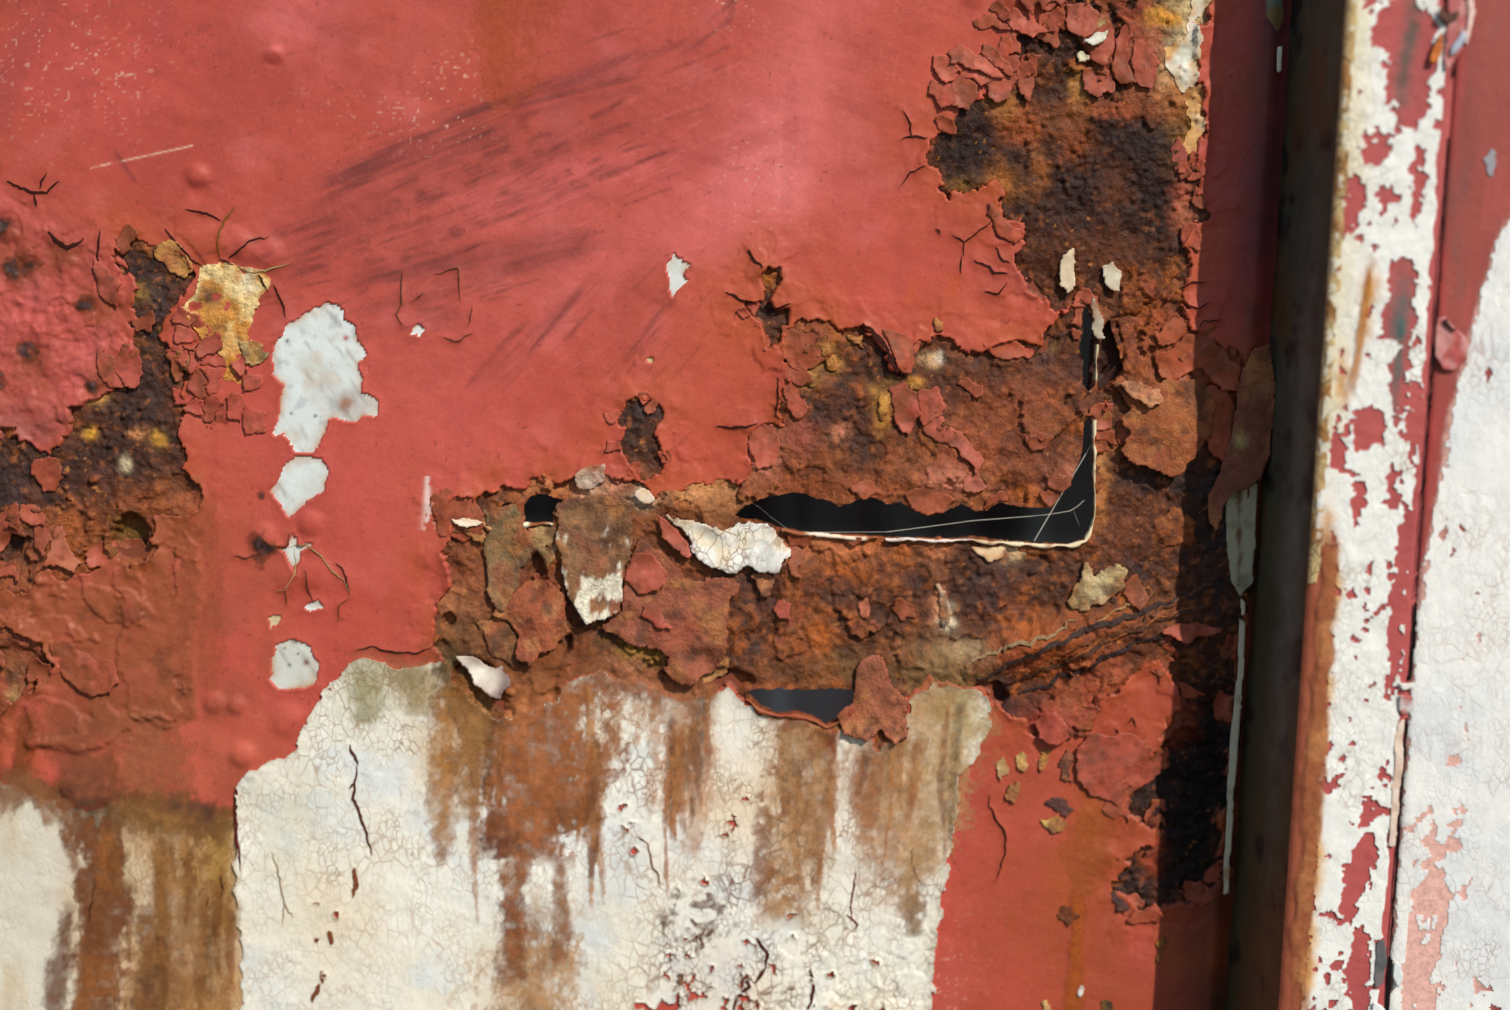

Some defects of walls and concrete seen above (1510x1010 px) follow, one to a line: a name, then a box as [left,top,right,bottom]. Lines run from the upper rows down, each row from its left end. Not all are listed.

rust [0,218,10,233]
crack [7,172,100,261]
rust [0,224,204,594]
peeling [154,239,378,518]
rust [252,535,276,563]
peeling [279,536,312,567]
rust [426,0,1256,1010]
rust [0,627,119,716]
rust [0,769,233,1010]
crack [205,789,334,1003]
crack [349,745,372,897]